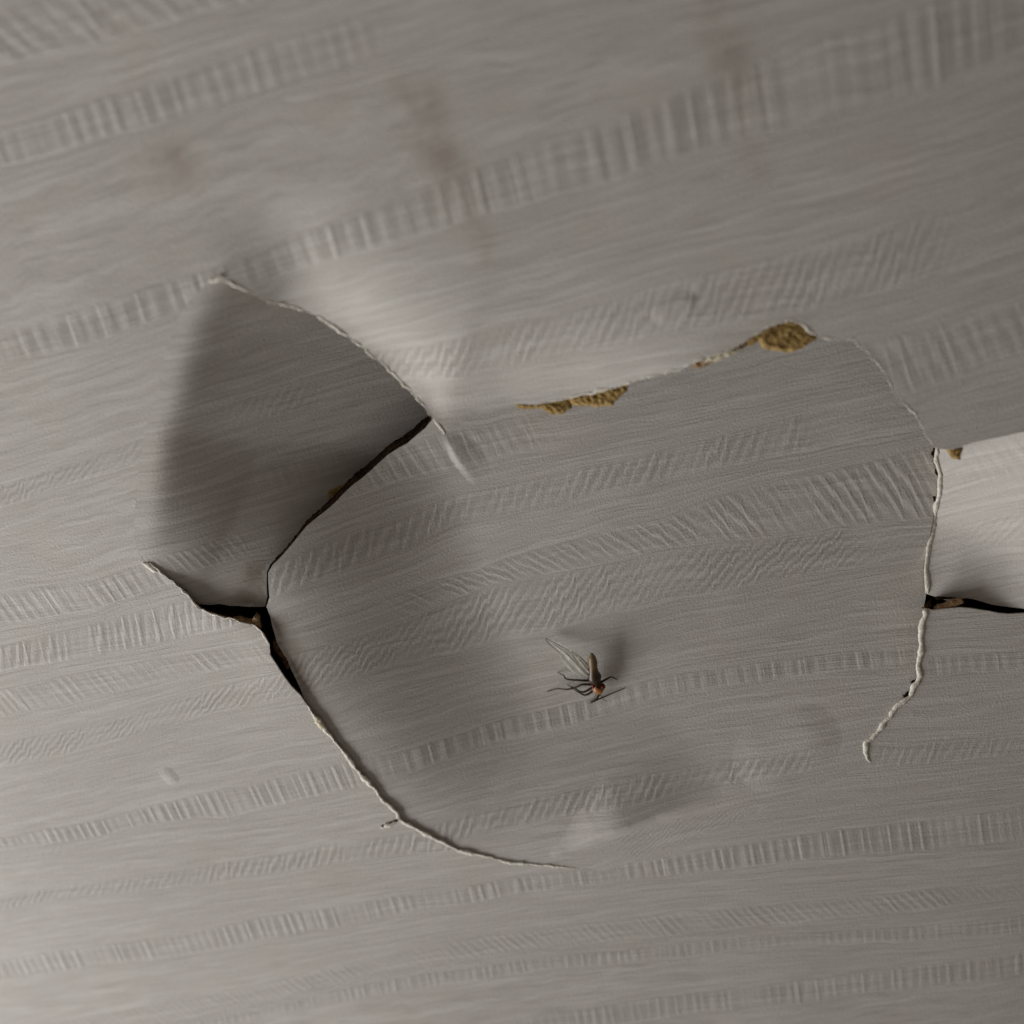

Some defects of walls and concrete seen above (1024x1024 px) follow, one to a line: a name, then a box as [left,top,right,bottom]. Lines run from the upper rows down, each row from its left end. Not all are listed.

spalling [692,321,818,368]
spalling [516,385,629,415]
spalling [946,447,963,460]
crack [149,416,431,698]
spalling [934,597,964,609]
crack [935,595,981,603]